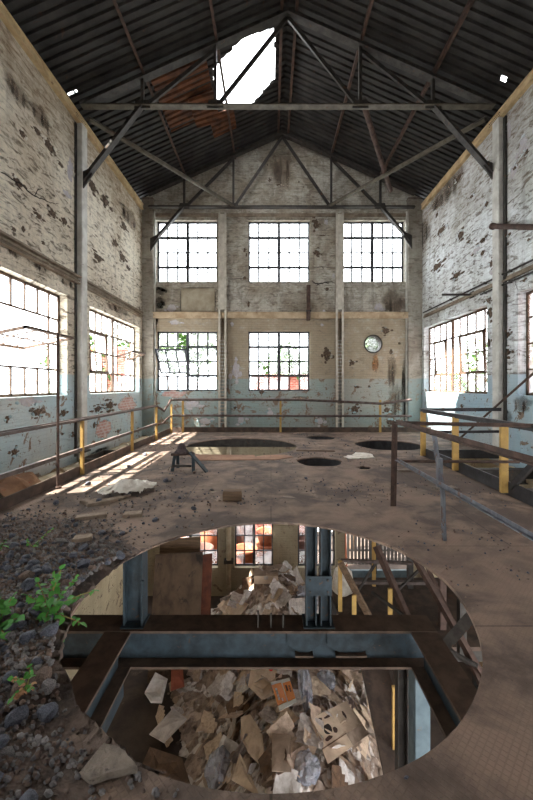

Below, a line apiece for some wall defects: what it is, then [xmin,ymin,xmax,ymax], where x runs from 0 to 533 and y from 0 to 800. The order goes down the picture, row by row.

peeling [19,125,75,182]
flaking render [508,134,530,179]
crack [1,172,58,204]
peeling [31,204,70,228]
peeling [89,179,129,233]
peeling [110,235,131,271]
peeling [456,226,492,275]
peeling [321,347,334,364]
flaking render [7,396,45,419]
spalling [89,396,137,440]